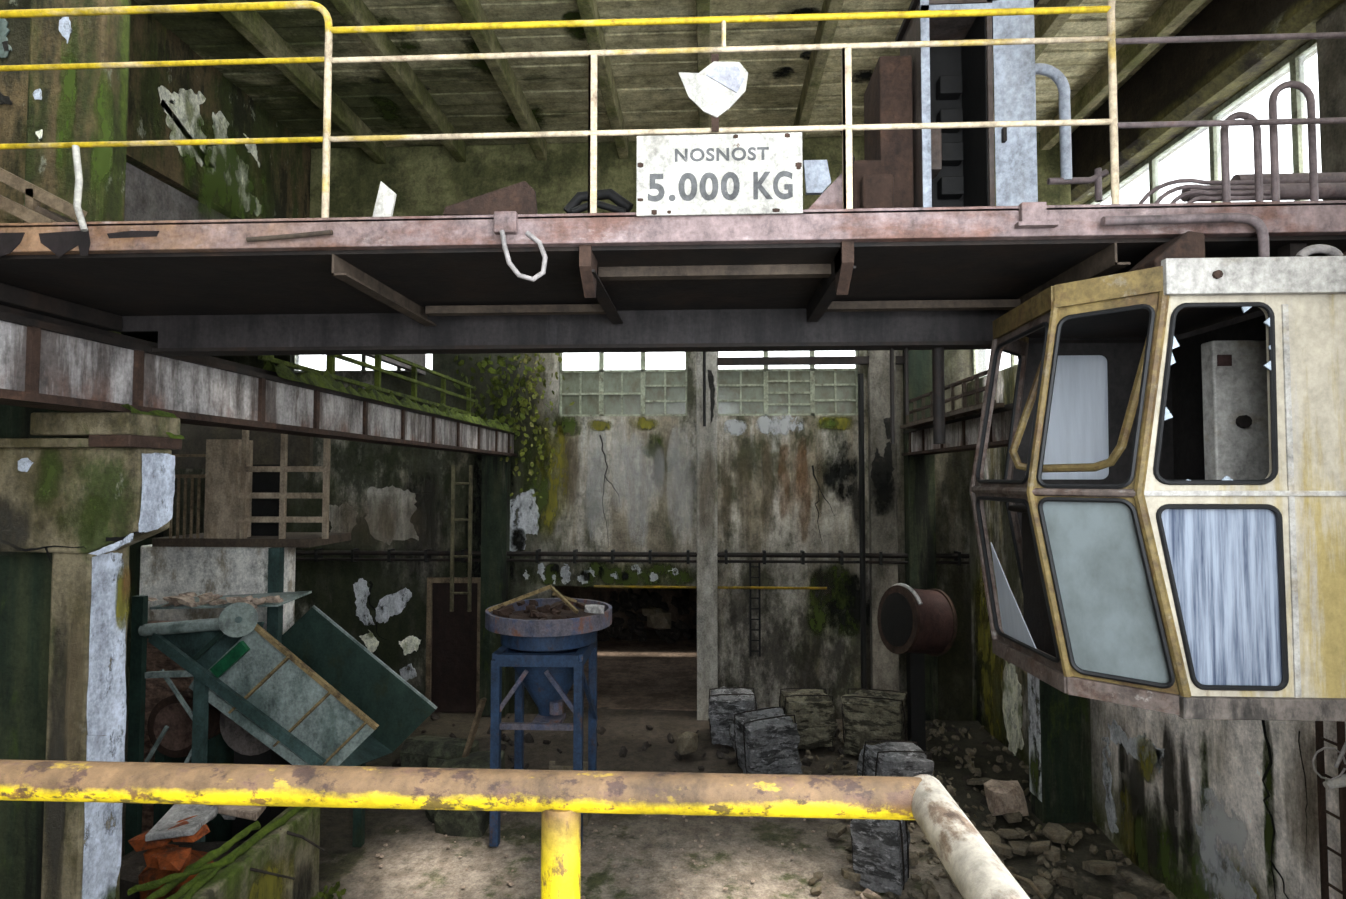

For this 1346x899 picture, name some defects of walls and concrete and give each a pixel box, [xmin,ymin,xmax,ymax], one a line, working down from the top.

leakage [56,51,77,180]
leakage [90,71,113,215]
flaking render [158,85,267,220]
leakage [725,415,803,435]
flaking render [329,485,419,545]
mould [823,440,859,526]
peeling [86,453,175,762]
flaking render [353,578,422,681]
mould [807,565,870,640]
peeling [82,802,123,899]
leakage [1116,725,1261,899]
leakage [1296,764,1318,854]